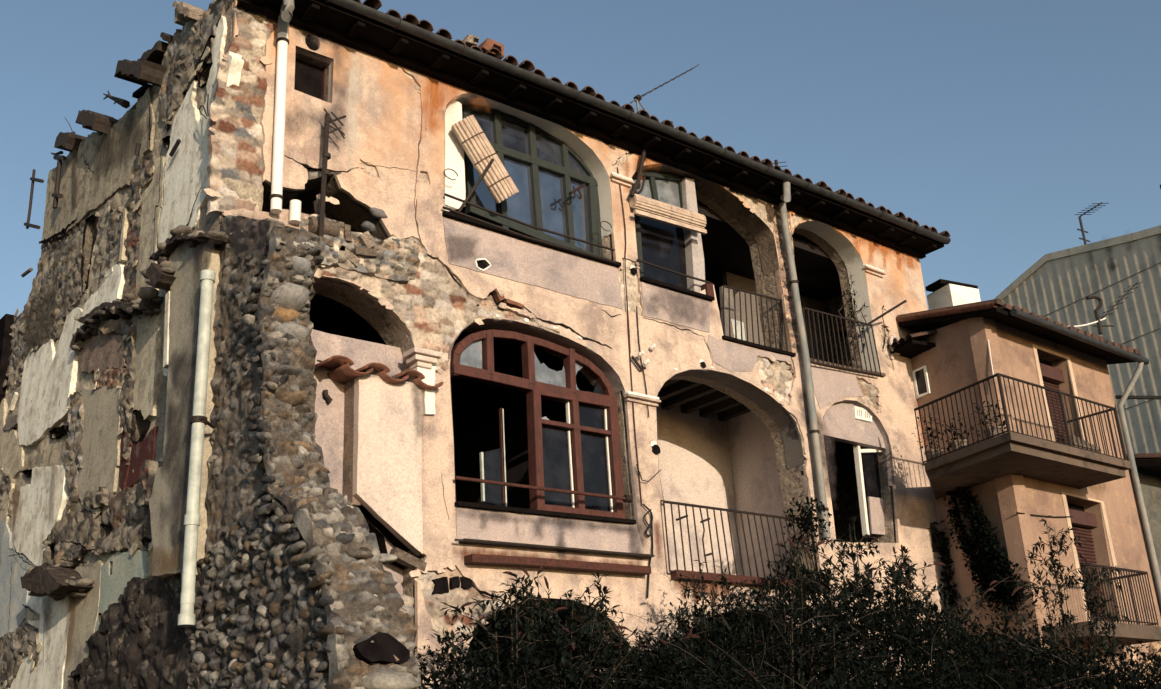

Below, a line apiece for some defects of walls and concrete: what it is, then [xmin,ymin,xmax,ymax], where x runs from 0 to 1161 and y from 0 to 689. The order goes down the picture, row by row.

spalling [3,0,235,411]
spalling [262,160,558,393]
crack [538,319,605,346]
spalling [724,186,820,535]
spalling [0,468,32,516]
spalling [42,315,163,574]
spalling [0,623,42,688]
spalling [67,574,205,689]
spalling [353,632,410,664]
spalling [356,504,503,646]